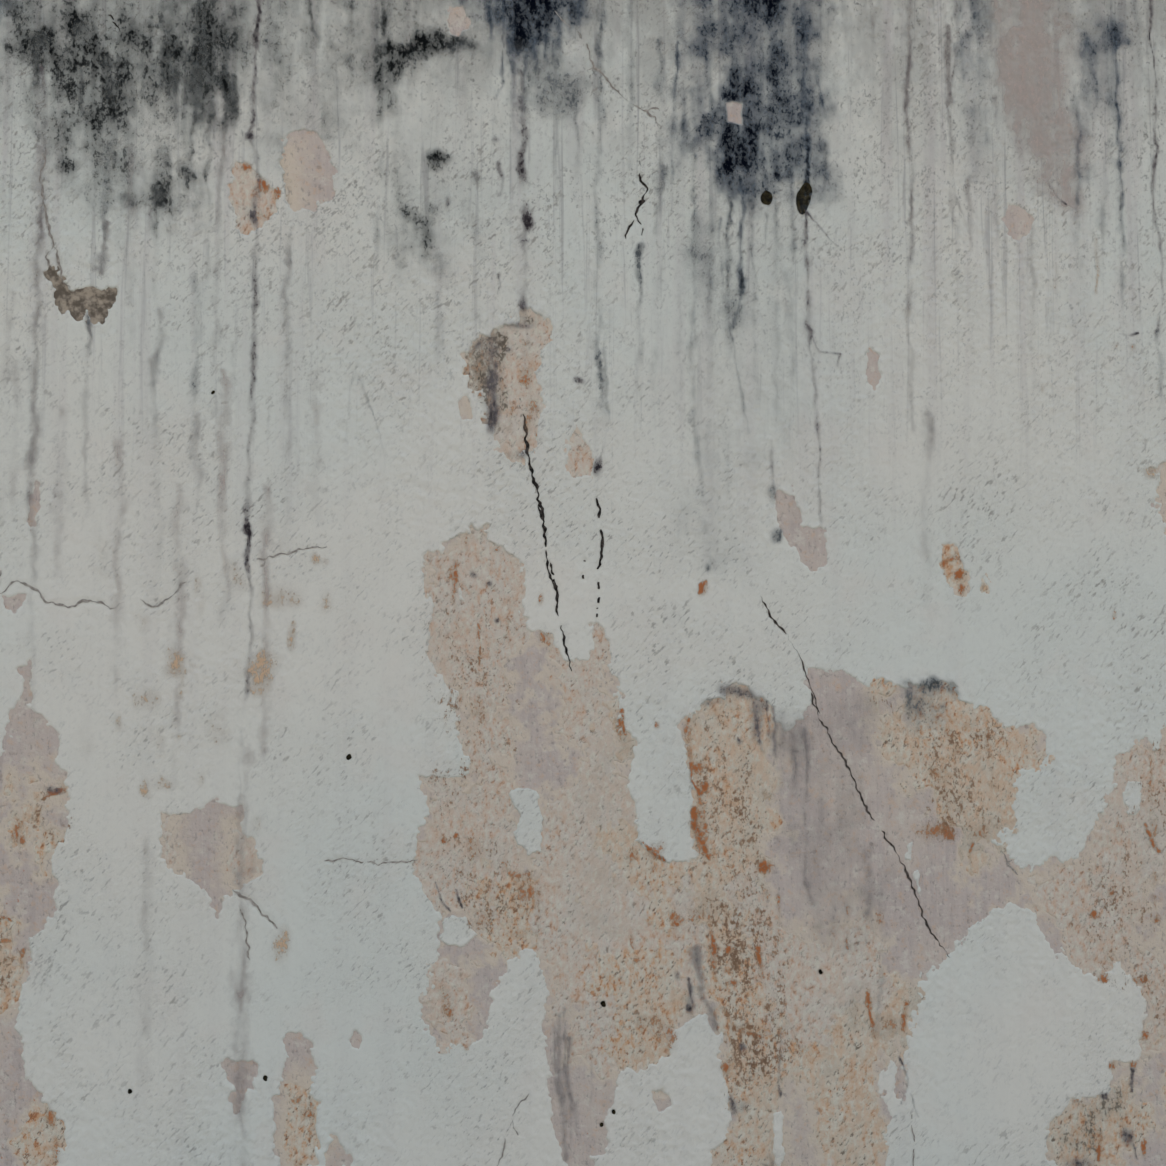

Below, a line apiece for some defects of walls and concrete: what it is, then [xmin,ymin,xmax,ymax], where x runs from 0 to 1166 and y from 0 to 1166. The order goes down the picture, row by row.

water stain [1,0,283,239]
water stain [347,3,476,116]
water stain [484,0,604,181]
water stain [657,0,829,339]
spalling [36,266,117,325]
peeling [458,304,553,468]
water stain [243,503,268,572]
crack [519,398,604,671]
peeling [0,659,70,1166]
peeling [159,798,264,919]
peeling [412,516,1166,1166]
crack [762,601,949,957]